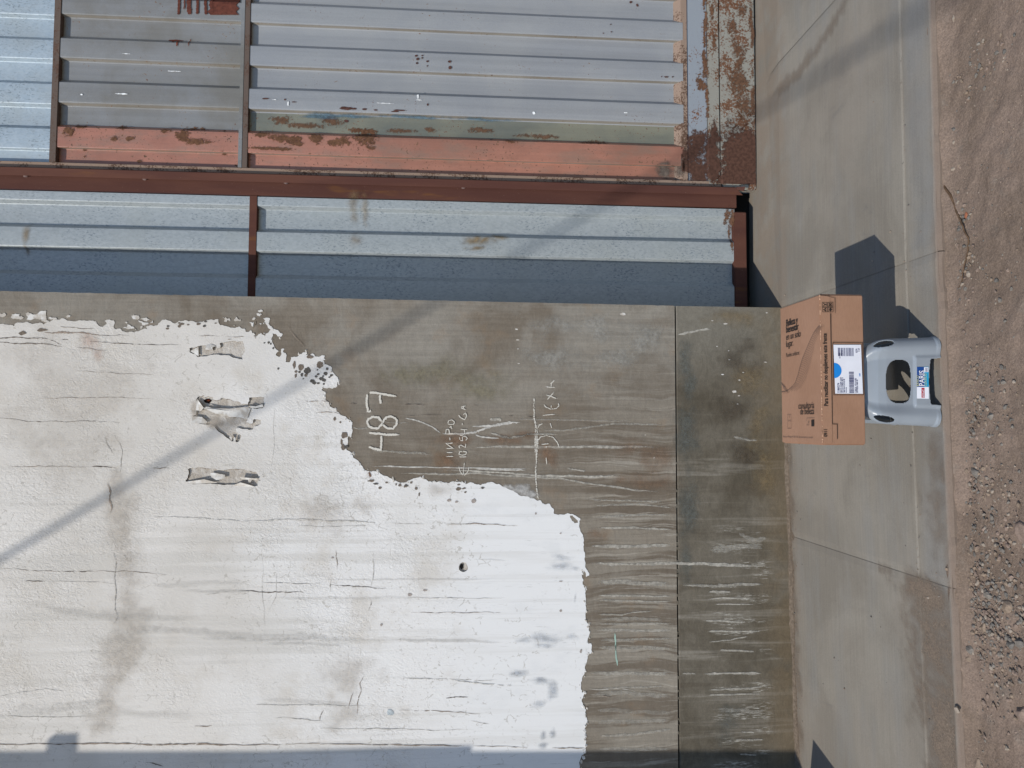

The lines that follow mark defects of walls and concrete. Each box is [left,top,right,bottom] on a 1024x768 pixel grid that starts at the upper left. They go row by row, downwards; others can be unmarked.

rust [678,0,756,185]
rust [242,114,435,151]
flaking render [166,310,284,360]
flaking render [192,396,264,442]
peeling [292,349,441,496]
flaking render [186,467,260,487]
damp [687,583,759,605]
damp [706,620,757,652]
damp [708,672,760,696]